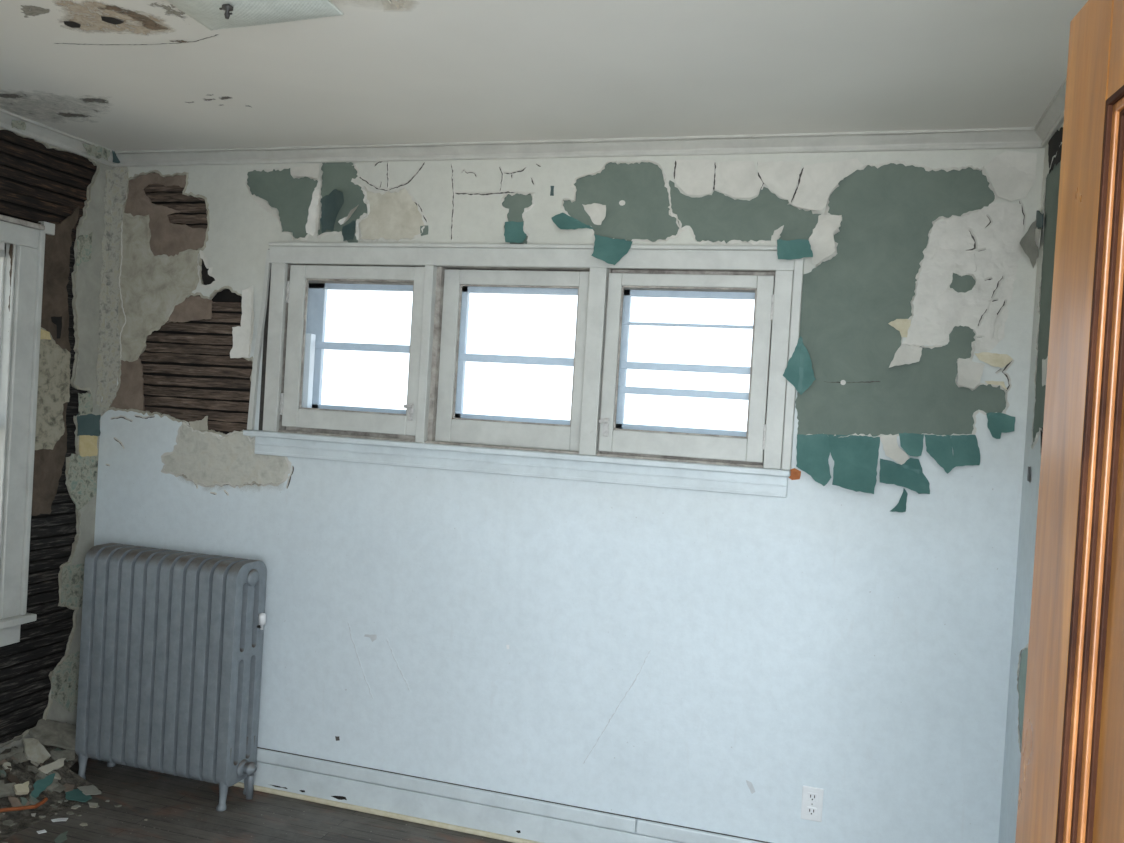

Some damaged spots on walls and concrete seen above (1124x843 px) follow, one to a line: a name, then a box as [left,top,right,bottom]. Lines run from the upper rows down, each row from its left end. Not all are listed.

peeling [245,162,370,243]
crack [359,161,541,241]
peeling [501,191,535,244]
peeling [550,158,1015,512]
flaking render [45,143,292,720]